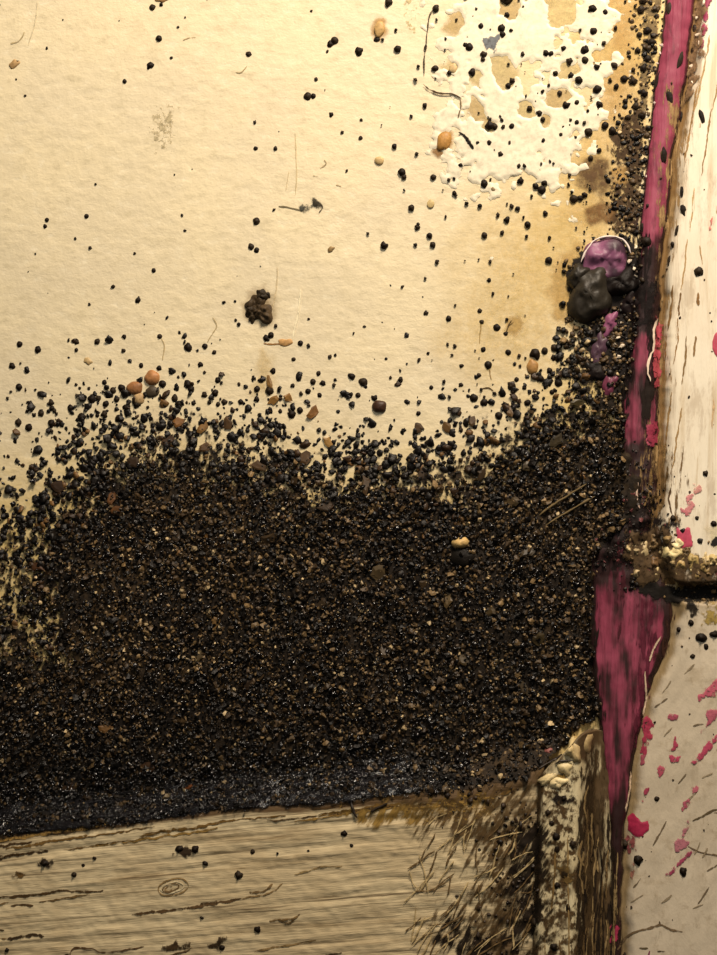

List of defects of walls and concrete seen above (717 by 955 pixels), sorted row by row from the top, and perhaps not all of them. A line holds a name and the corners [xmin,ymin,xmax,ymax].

leakage [478,0,524,38]
leakage [463,36,487,76]
leakage [543,46,583,84]
leakage [476,112,514,156]
leakage [559,109,593,144]
leakage [430,163,482,208]
leakage [517,163,547,198]
leakage [94,334,143,368]
leakage [338,390,361,406]
leakage [172,845,199,859]